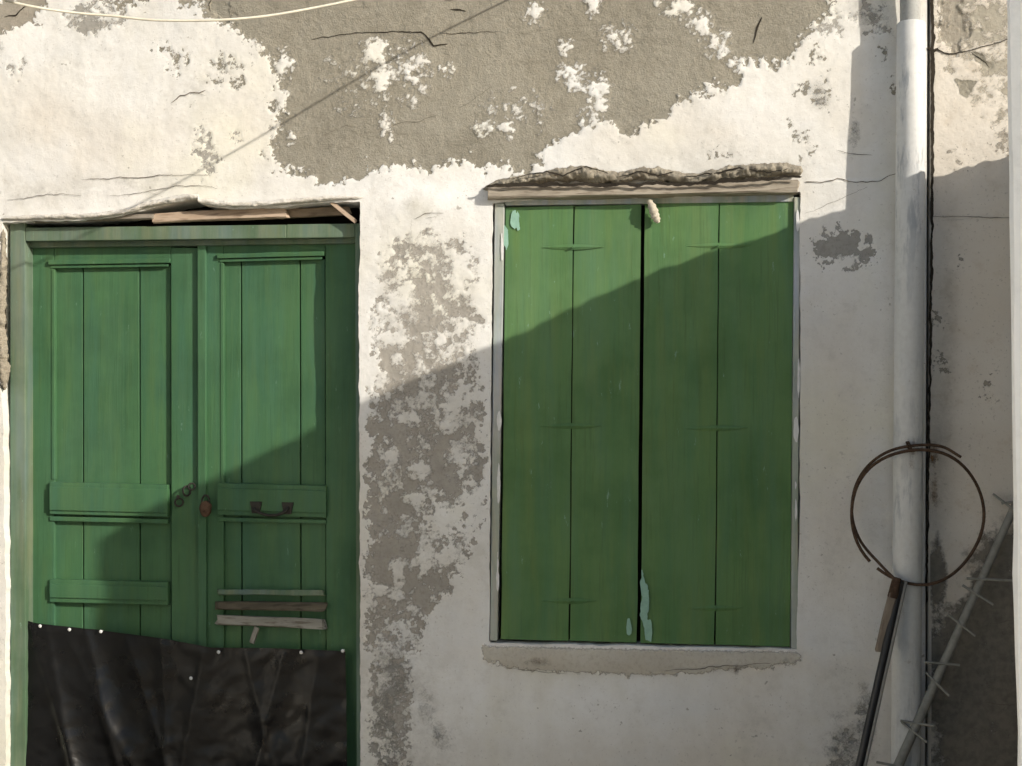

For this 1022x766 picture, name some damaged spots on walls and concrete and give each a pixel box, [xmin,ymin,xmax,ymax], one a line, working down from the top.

crack [12,174,216,200]
crack [311,0,499,47]
peeling [0,0,891,390]
crack [925,0,1009,603]
peeling [933,0,1009,157]
peeling [363,228,502,766]